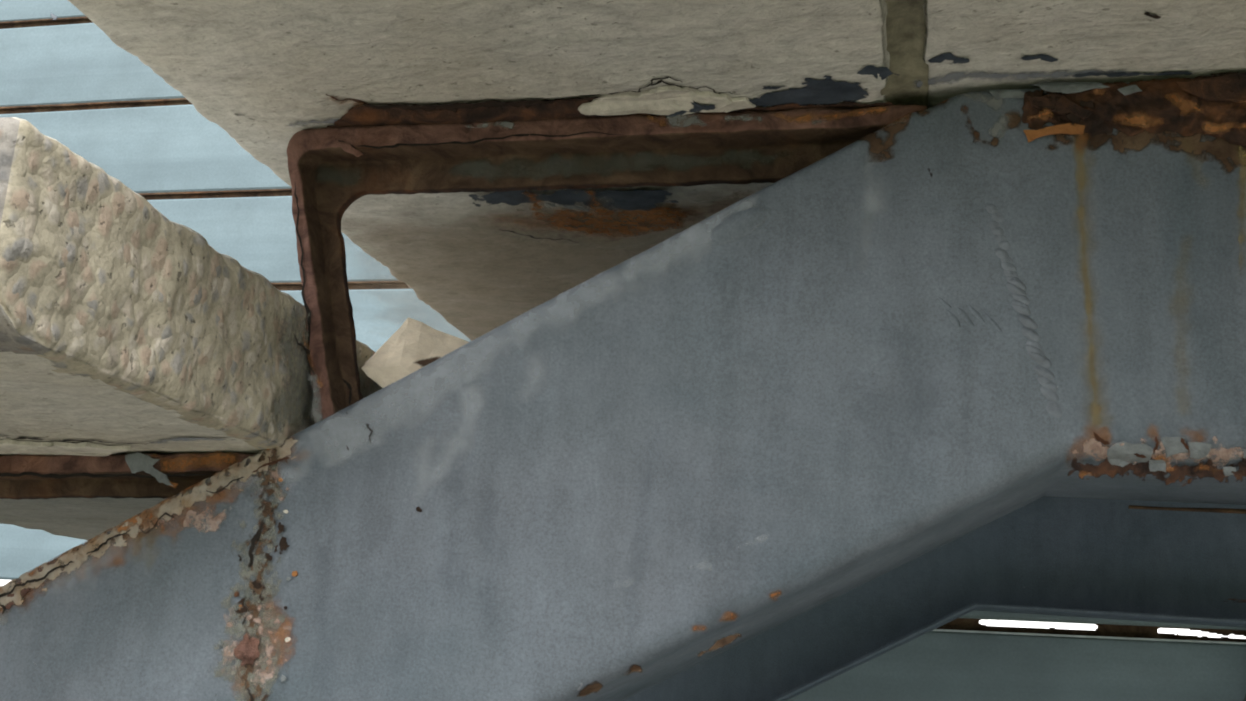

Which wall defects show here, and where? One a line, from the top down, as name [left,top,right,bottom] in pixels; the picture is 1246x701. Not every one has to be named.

spalling [327,97,666,127]
spalling [702,97,893,113]
rust [777,92,1008,161]
rust [469,187,696,237]
rust [415,357,440,367]
peeling [1068,431,1246,486]
rust [0,449,298,701]